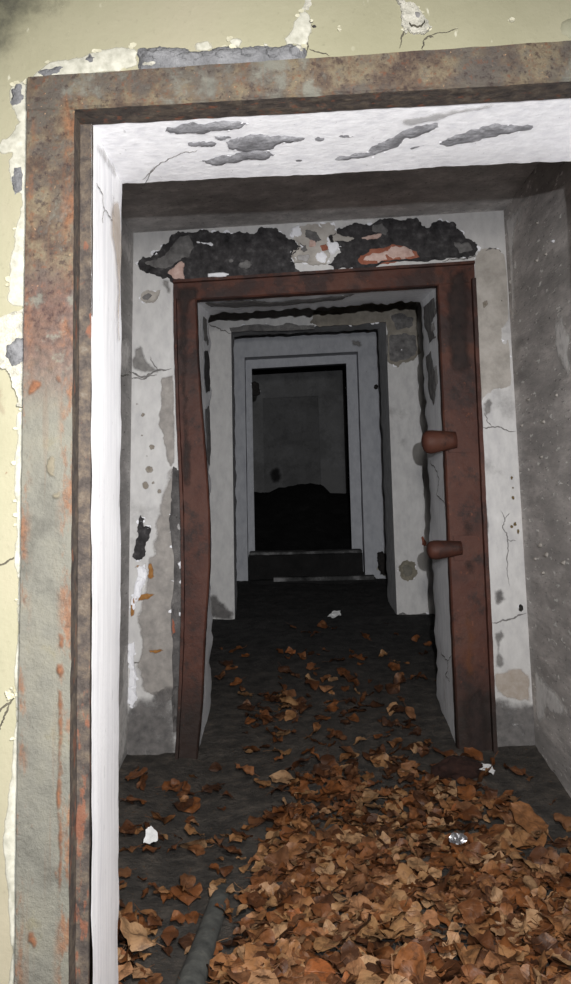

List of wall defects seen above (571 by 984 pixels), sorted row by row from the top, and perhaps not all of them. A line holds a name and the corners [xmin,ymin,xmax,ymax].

flaking render [396,0,432,35]
peeling [335,123,438,161]
peeling [439,123,533,147]
peeling [135,218,481,304]
peeling [0,0,324,984]
crack [0,698,14,729]